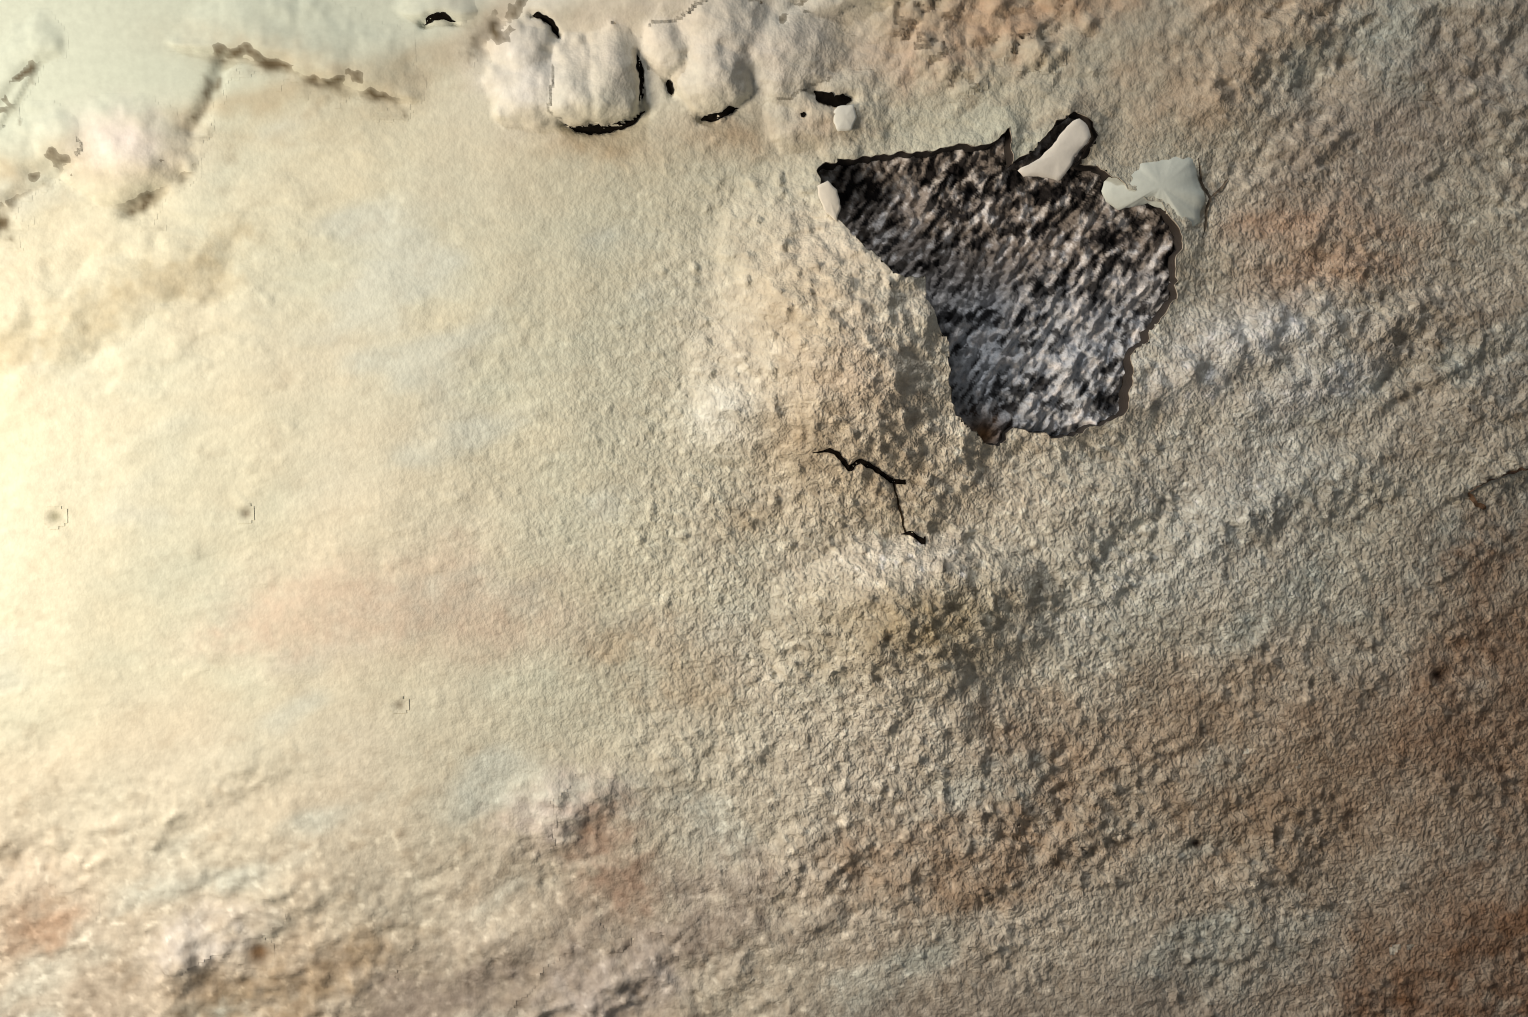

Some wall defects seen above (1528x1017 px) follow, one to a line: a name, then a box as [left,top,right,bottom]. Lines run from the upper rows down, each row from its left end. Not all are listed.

spalling [817,111,1206,446]
crack [813,448,926,544]
crack [1468,467,1528,510]